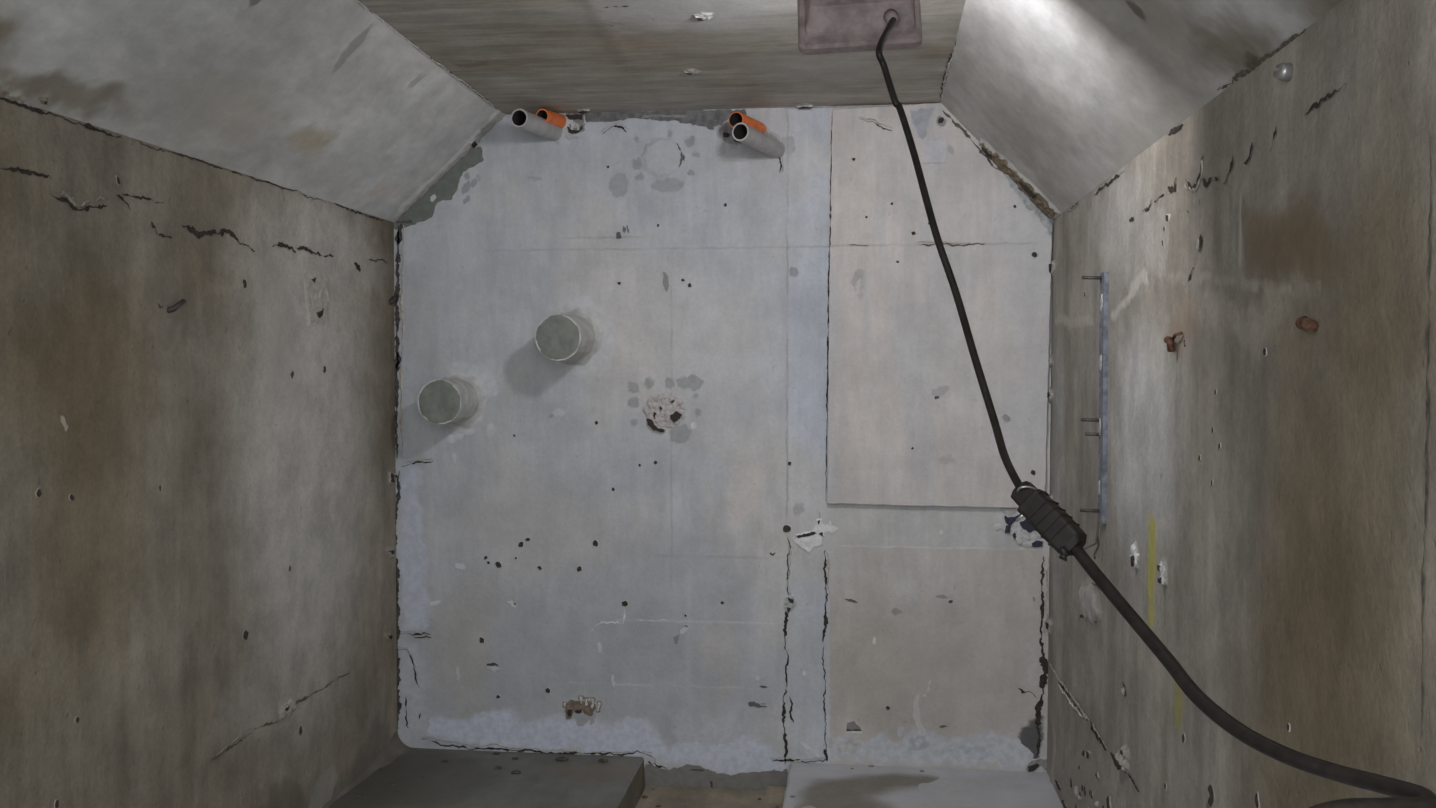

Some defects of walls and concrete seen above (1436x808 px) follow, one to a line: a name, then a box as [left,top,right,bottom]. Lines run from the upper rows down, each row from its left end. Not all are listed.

spalling [355,0,506,223]
spalling [979,137,1078,219]
crack [1129,84,1346,222]
rust [1159,287,1211,388]
spalling [642,391,698,434]
spalling [782,518,839,554]
spalling [993,508,1044,550]
damp [248,455,1059,808]
crack [771,513,830,764]
crack [1018,556,1049,756]
spalling [563,695,602,720]
spalling [1114,742,1131,777]